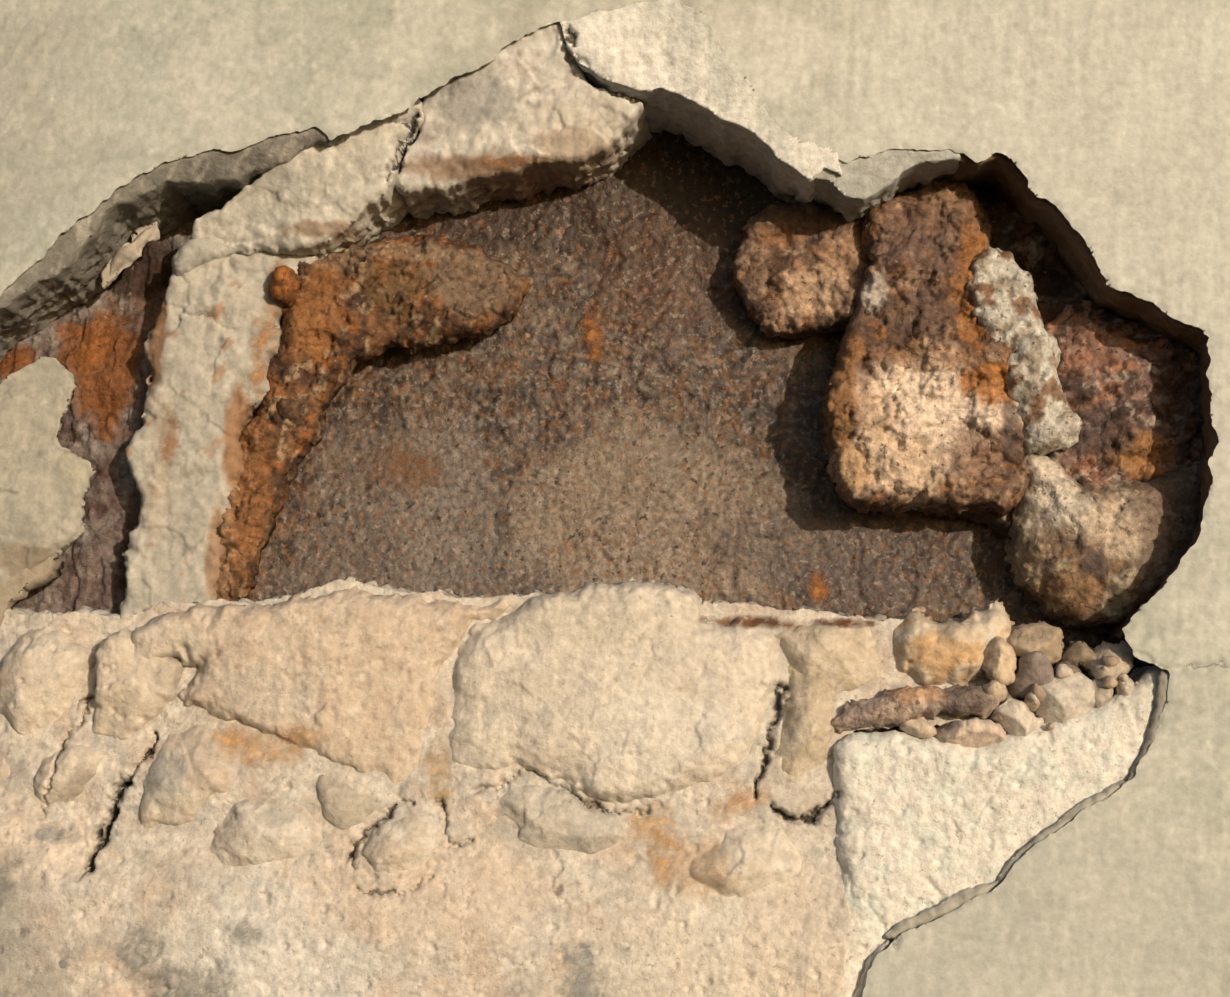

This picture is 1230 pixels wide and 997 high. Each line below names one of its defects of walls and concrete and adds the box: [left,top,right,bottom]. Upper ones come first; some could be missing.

peeling [0,357,96,626]
rust [0,214,203,615]
spalling [0,127,339,362]
rust [250,315,276,385]
spalling [560,0,1219,644]
rust [818,178,1030,518]
crack [54,697,94,773]
crack [87,732,159,872]
crack [754,684,830,823]
peeling [833,666,1170,997]